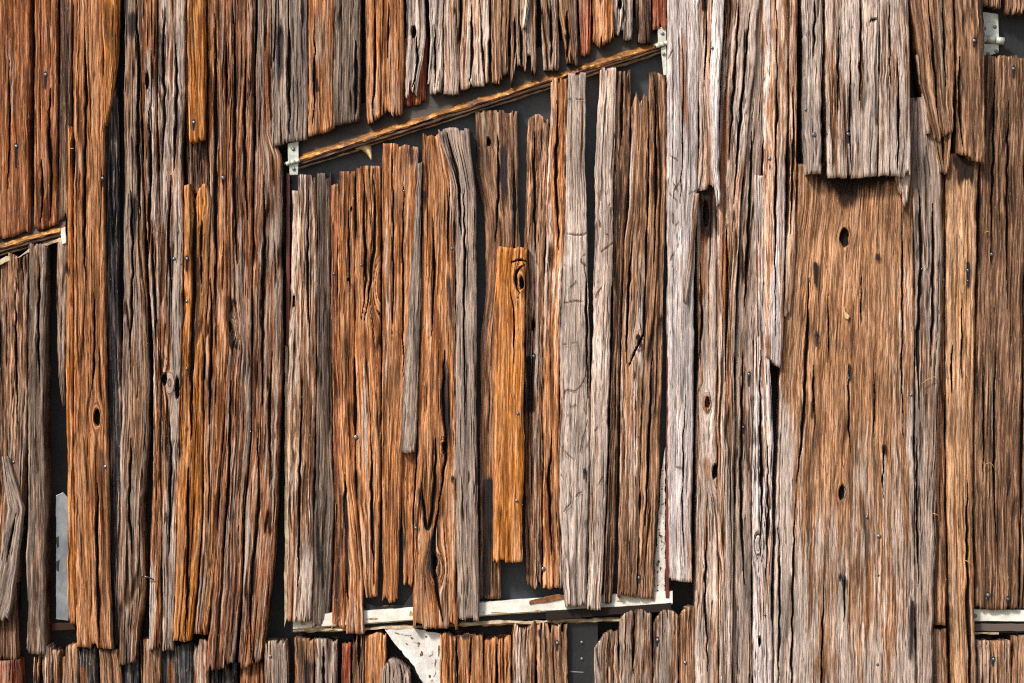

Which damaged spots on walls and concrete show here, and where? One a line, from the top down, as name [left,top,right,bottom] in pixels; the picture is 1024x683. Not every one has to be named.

crack [422,134,466,618]
crack [510,2,708,554]